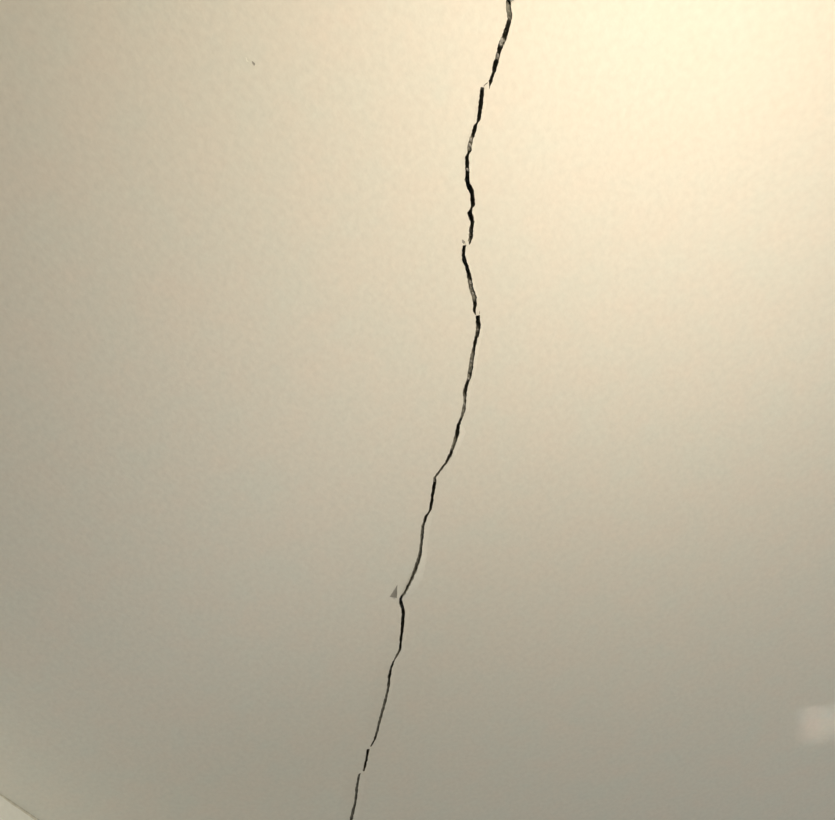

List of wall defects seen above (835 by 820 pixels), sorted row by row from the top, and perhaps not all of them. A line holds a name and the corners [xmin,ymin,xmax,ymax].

crack [350,0,515,820]